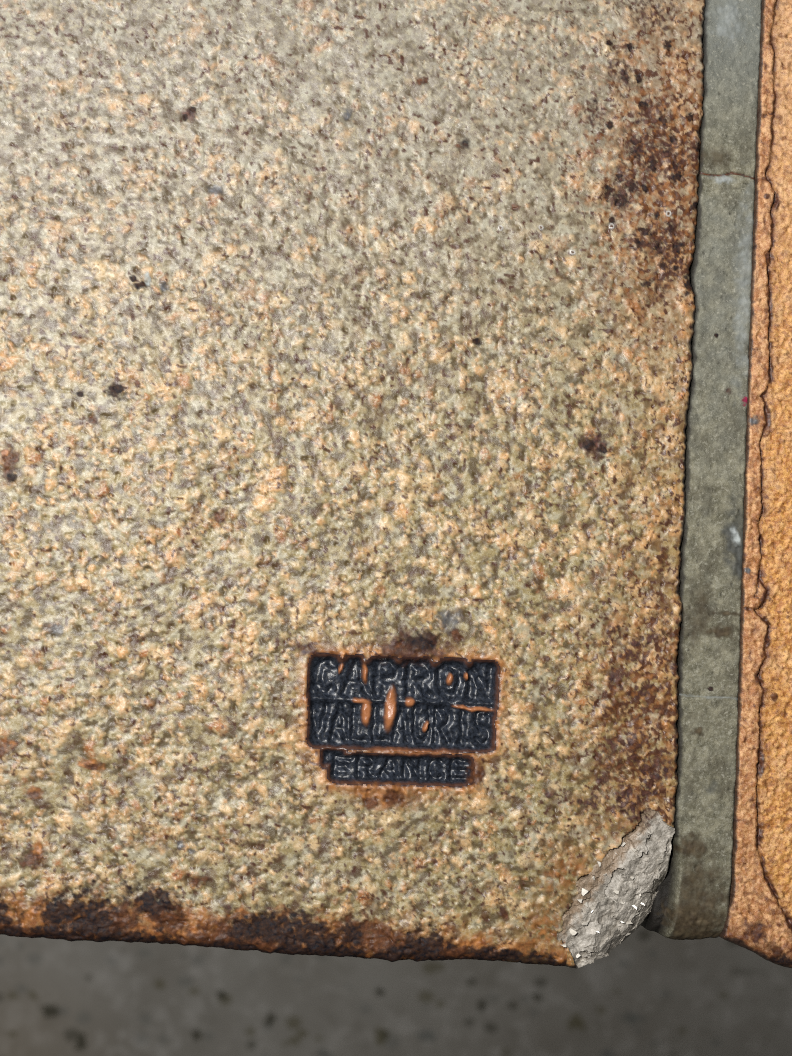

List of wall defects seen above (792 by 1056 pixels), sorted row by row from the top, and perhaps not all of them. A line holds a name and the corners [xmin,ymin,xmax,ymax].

corrosion [588,93,613,129]
corrosion [606,40,641,96]
corrosion [630,0,672,50]
corrosion [605,99,701,304]
crack [699,167,792,930]
corrosion [597,621,677,720]
corrosion [577,731,671,820]
spalling [556,808,675,968]